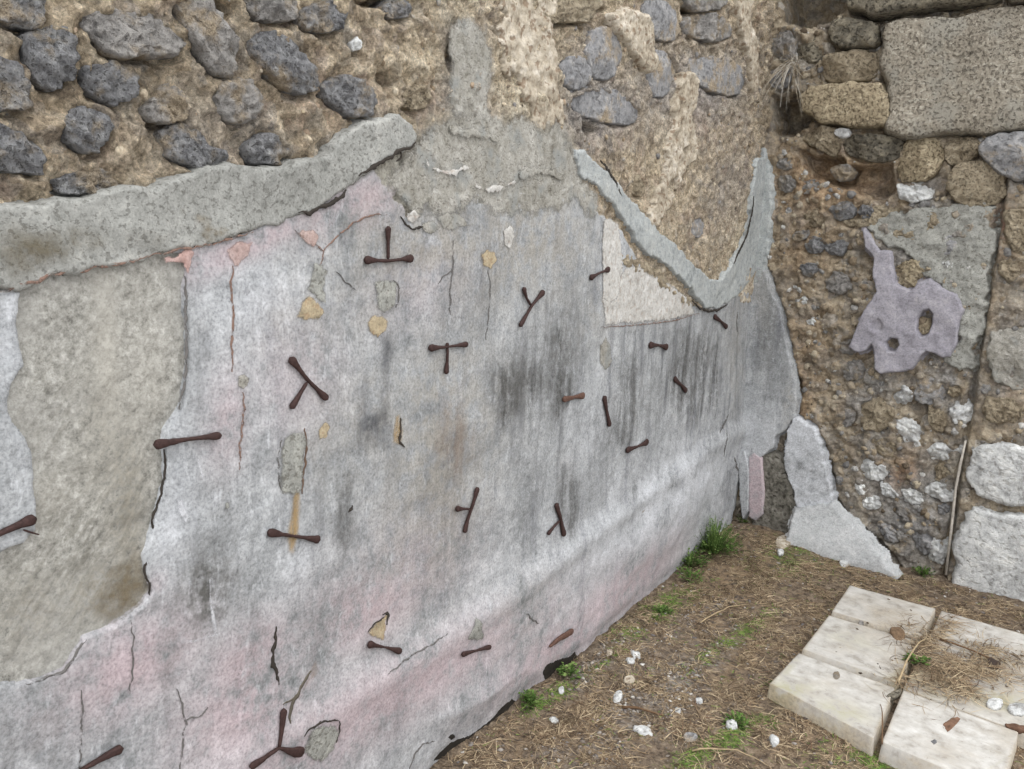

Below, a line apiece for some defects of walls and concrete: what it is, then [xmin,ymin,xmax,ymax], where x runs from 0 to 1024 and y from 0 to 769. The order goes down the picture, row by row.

flaking render [387,18,598,248]
flaking render [738,266,802,534]
flaking render [0,252,185,682]
crack [151,449,167,529]
crack [143,562,151,595]
crack [270,626,341,743]
crack [388,633,448,674]